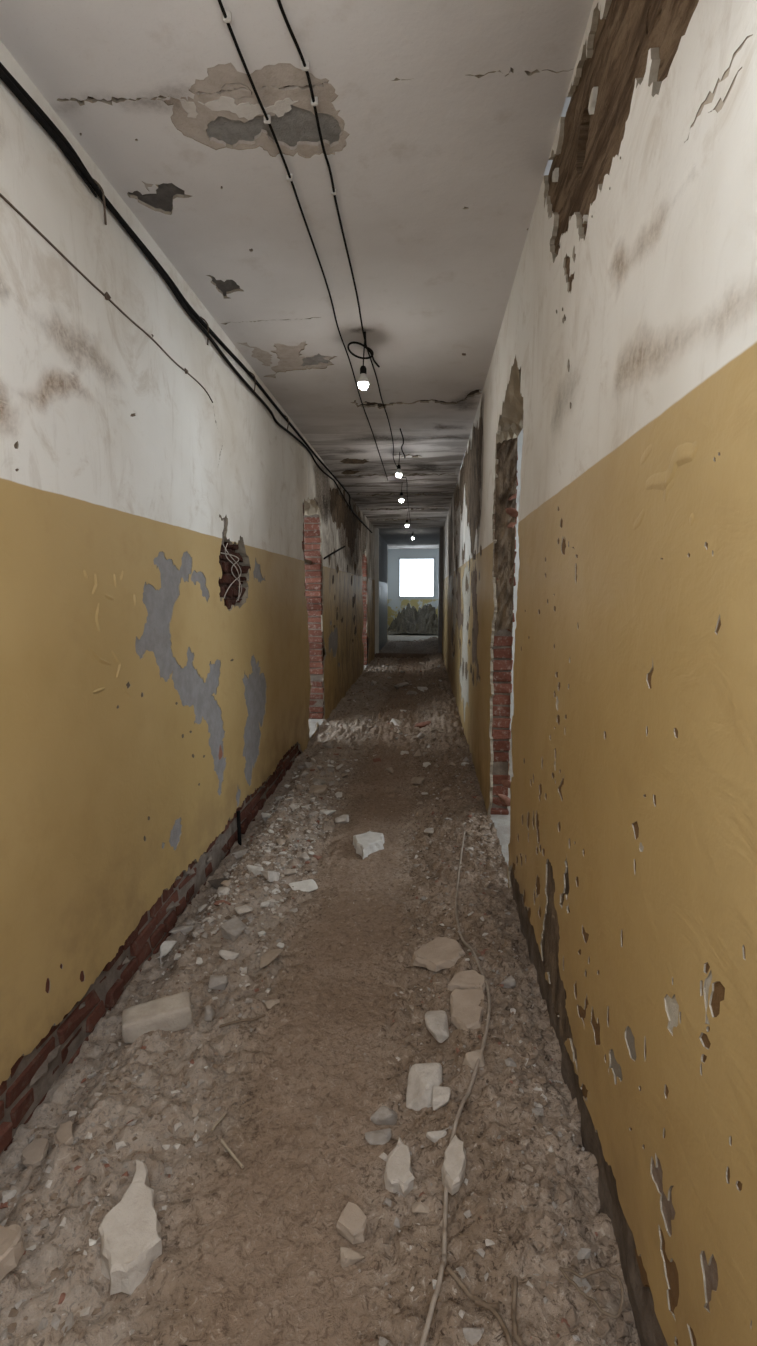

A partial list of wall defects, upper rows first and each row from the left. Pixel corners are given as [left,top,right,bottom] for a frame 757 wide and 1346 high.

spalling [165,63,349,157]
flaking render [548,0,699,291]
spalling [128,181,185,212]
spalling [212,276,240,296]
spalling [240,342,334,377]
peeling [558,507,578,582]
flaking render [0,542,301,1155]
flaking render [510,672,697,1346]
peeling [701,963,725,1071]
peeling [702,1251,719,1311]